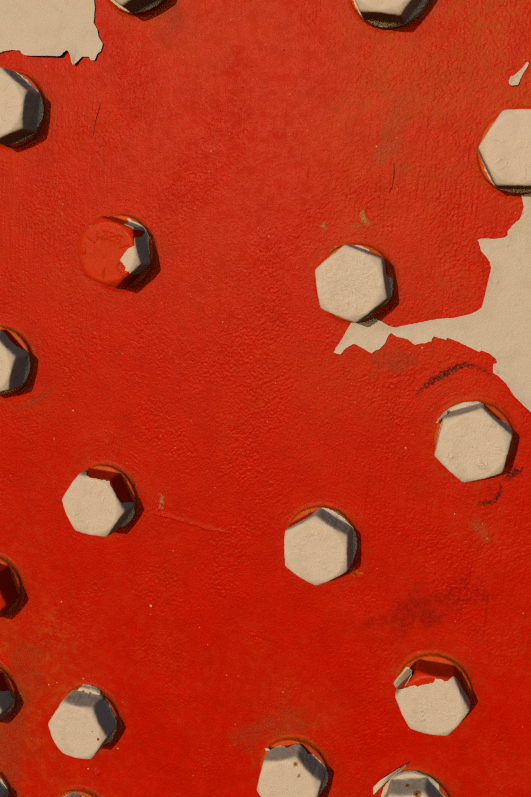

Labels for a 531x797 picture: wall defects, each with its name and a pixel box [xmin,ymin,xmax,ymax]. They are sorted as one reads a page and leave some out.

peeling [0,0,103,65]
peeling [334,193,531,412]
peeling [393,667,413,688]
peeling [373,764,407,795]